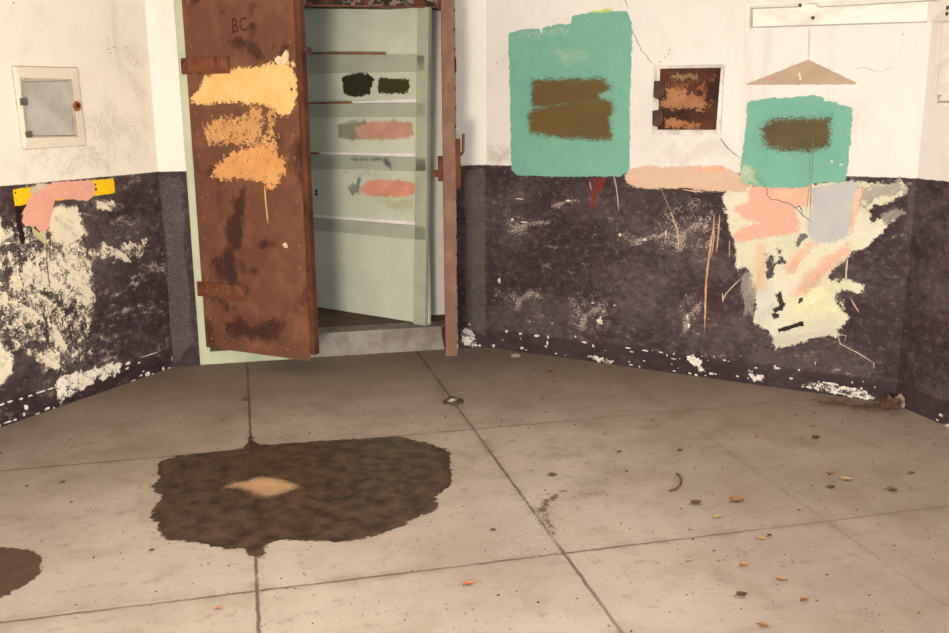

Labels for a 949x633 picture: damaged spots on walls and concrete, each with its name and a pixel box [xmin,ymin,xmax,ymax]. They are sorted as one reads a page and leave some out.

leakage [150,436,453,559]
leakage [0,547,44,598]